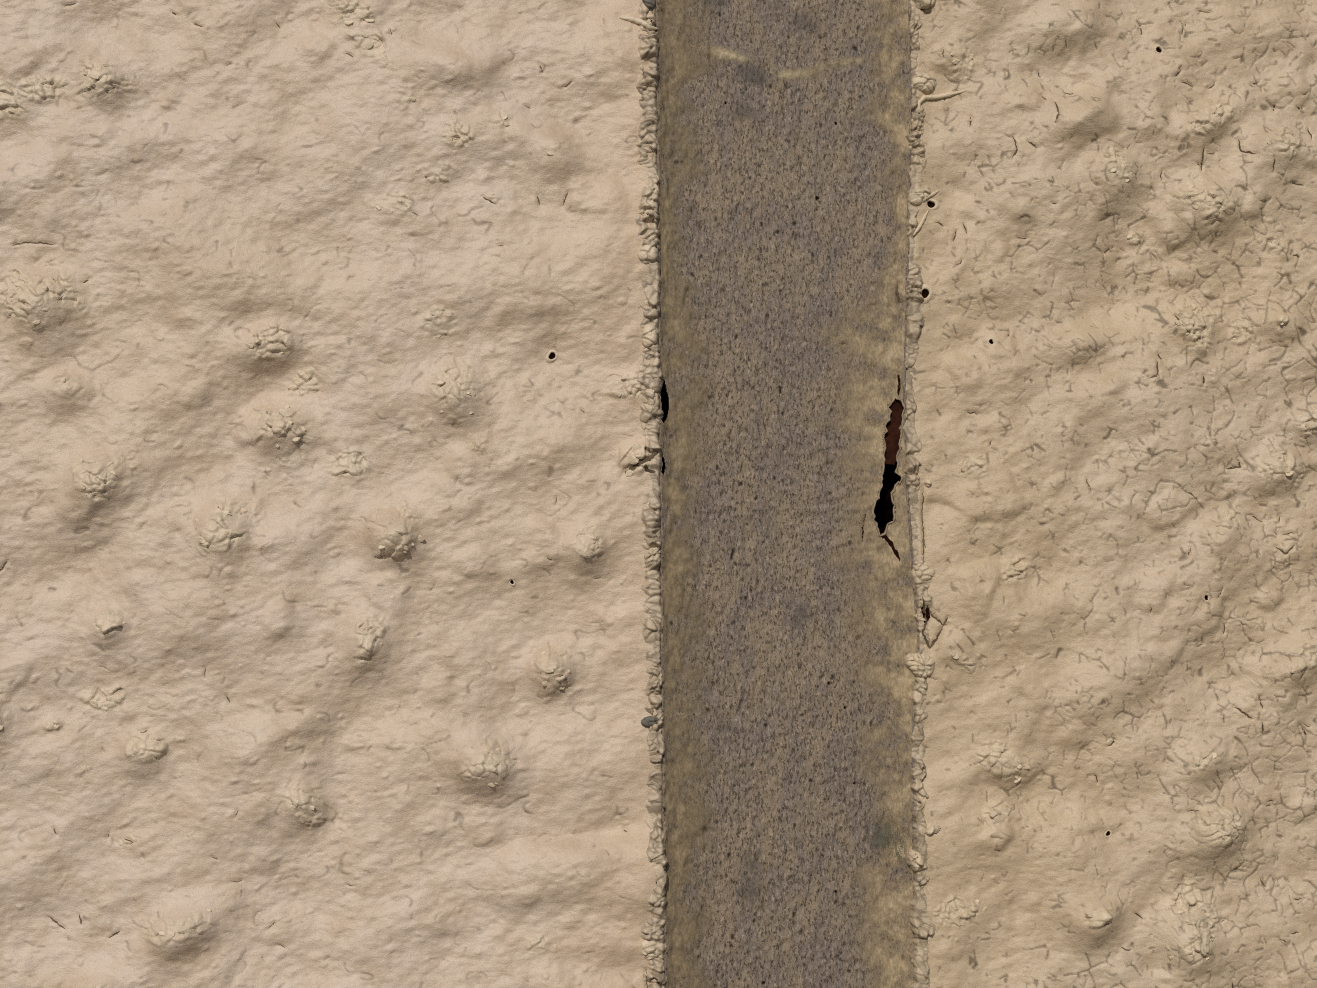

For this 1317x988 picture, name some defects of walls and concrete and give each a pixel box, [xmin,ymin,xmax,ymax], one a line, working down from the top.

crack [1012,72,1073,158]
crack [1198,139,1303,185]
crack [919,491,927,562]
crack [1187,460,1295,554]
crack [922,596,948,648]
crack [1235,696,1264,733]